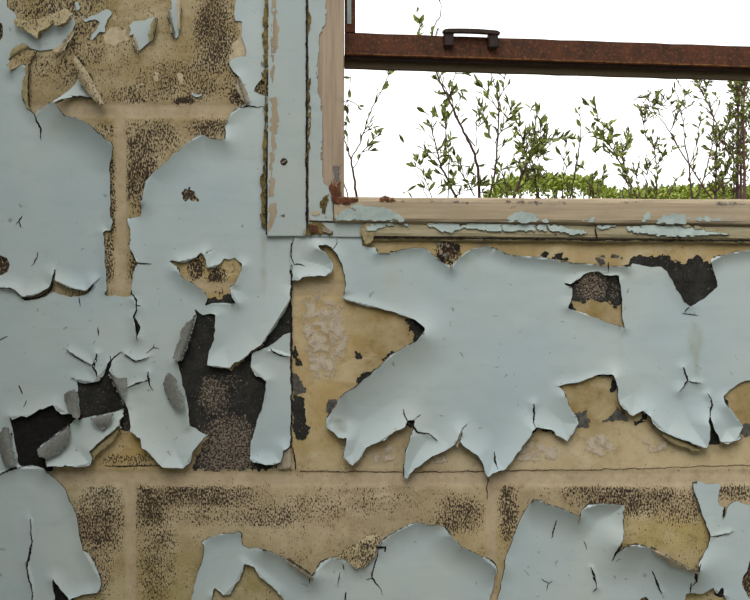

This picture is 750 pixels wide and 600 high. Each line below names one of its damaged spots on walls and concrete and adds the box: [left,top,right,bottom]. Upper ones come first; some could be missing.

peeling [0,0,268,301]
corrosion [329,182,358,204]
crack [68,293,156,390]
peeling [0,194,750,600]
crack [270,239,749,500]
crack [25,519,33,600]
crack [367,542,386,595]